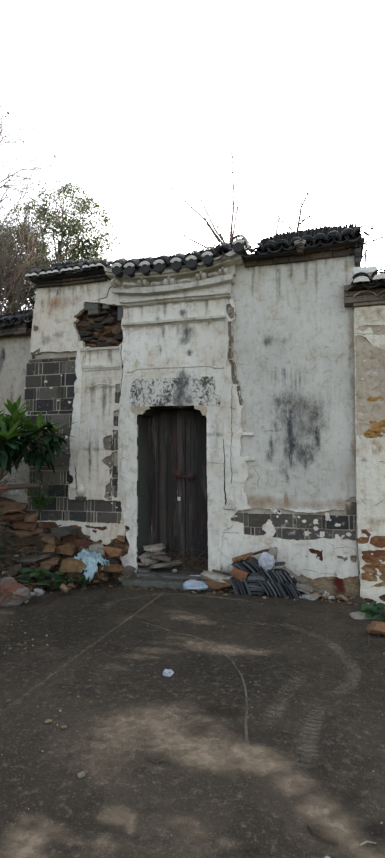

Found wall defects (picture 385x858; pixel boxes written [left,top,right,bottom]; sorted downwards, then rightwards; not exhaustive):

peeling [24,348,129,579]
spalling [77,302,123,348]
damp [277,400,319,460]
peeling [354,325,385,439]
peeling [231,496,385,612]